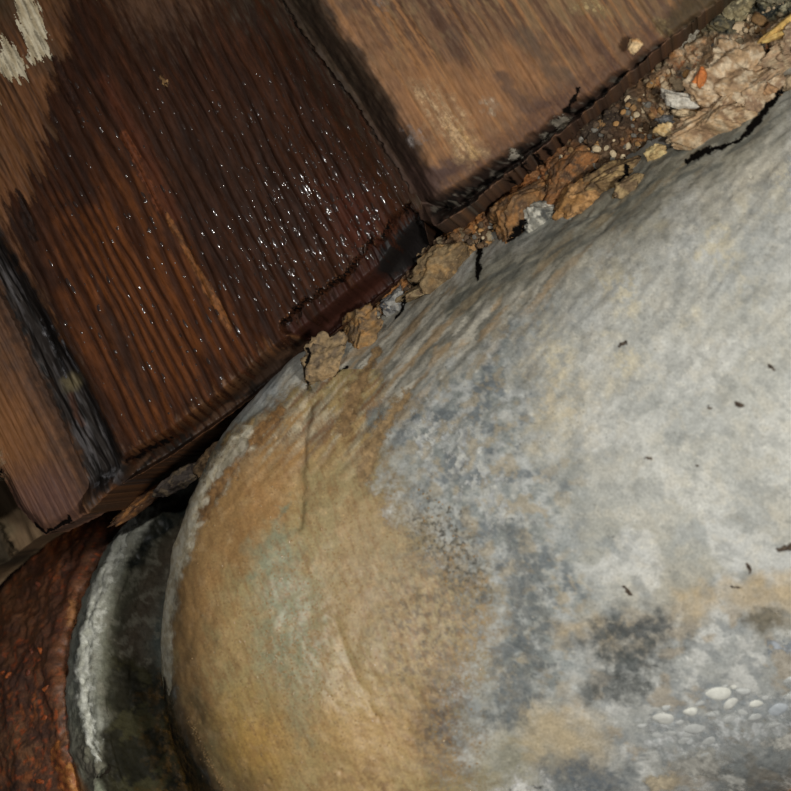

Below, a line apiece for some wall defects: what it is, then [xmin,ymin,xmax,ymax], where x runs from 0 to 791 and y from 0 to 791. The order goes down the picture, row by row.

spalling [692,66,707,89]
peeling [540,114,572,141]
spalling [653,109,697,137]
damp [3,0,417,465]
corrosion [164,346,494,791]
corrosion [64,599,78,628]
damp [745,608,791,655]
damp [584,608,671,705]
corrosion [51,740,82,791]
damp [506,761,626,791]
damp [643,697,791,791]